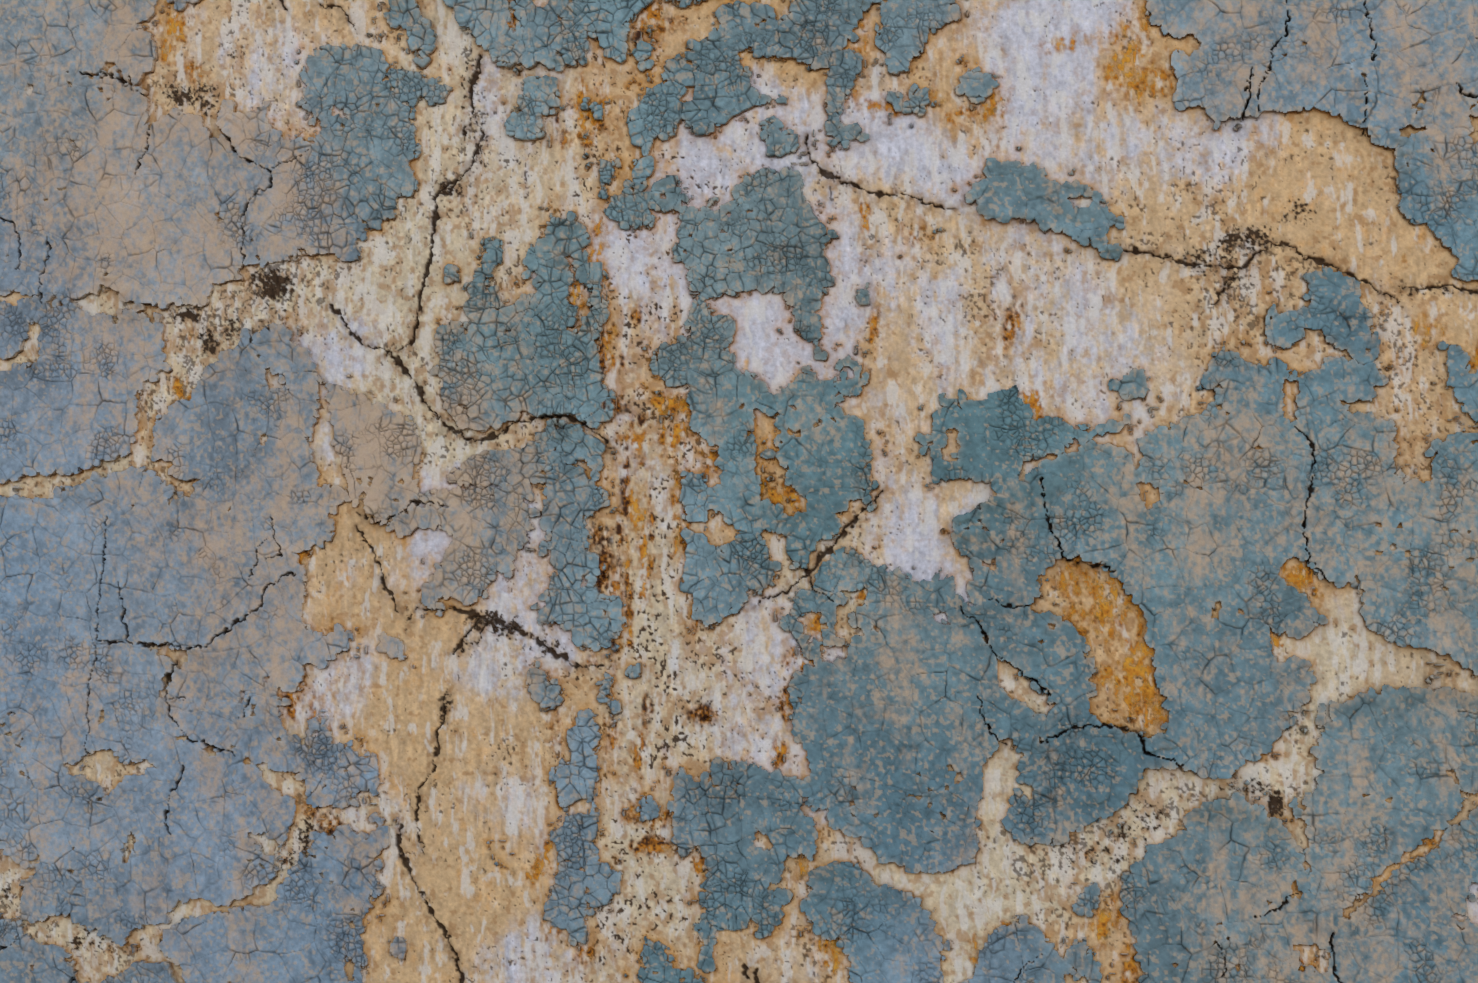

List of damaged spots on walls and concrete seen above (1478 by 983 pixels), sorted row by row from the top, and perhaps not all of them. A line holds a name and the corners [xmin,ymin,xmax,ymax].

crack [396,707,465,983]
peeling [331,248,551,494]
peeling [367,0,538,306]
crack [330,55,609,444]
crack [357,500,604,668]
rust [623,791,671,855]
rust [592,393,718,652]
rust [687,704,714,724]
peeling [19,482,1478,983]
peeling [500,0,1478,844]
rust [1059,555,1168,738]
crack [1123,241,1478,303]